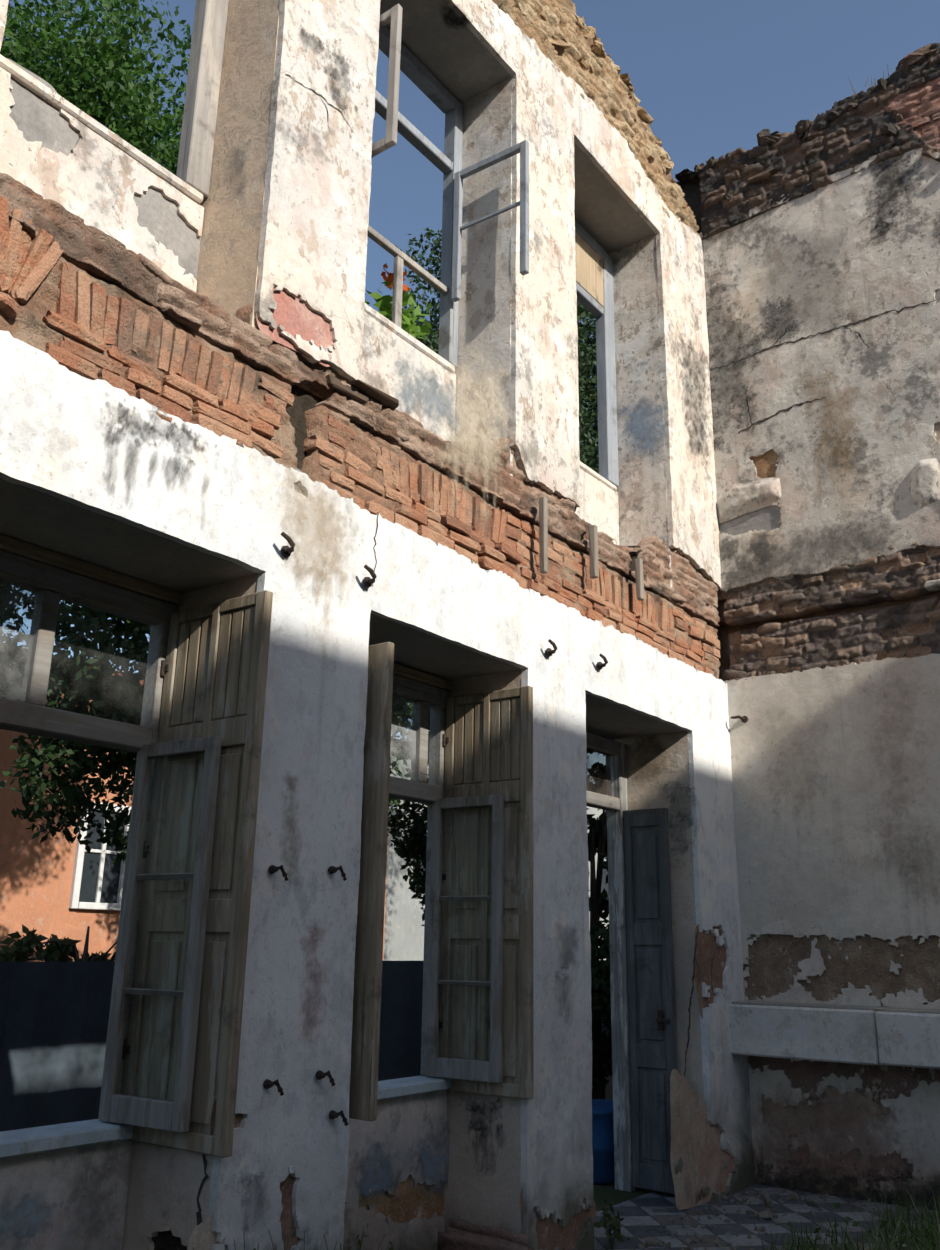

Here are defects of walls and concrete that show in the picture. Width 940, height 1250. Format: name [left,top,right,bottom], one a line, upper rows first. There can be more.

flaking render [7,58,80,155]
flaking render [133,187,201,281]
peeling [256,277,336,367]
crack [710,300,936,434]
damp [106,402,204,487]
peeling [694,924,728,1019]
flaking render [743,933,940,1007]
flaking render [748,1056,940,1107]
flaking render [670,1069,735,1210]
peeling [152,1215,235,1250]
crack [196,1154,209,1226]
flaking render [279,1166,301,1250]